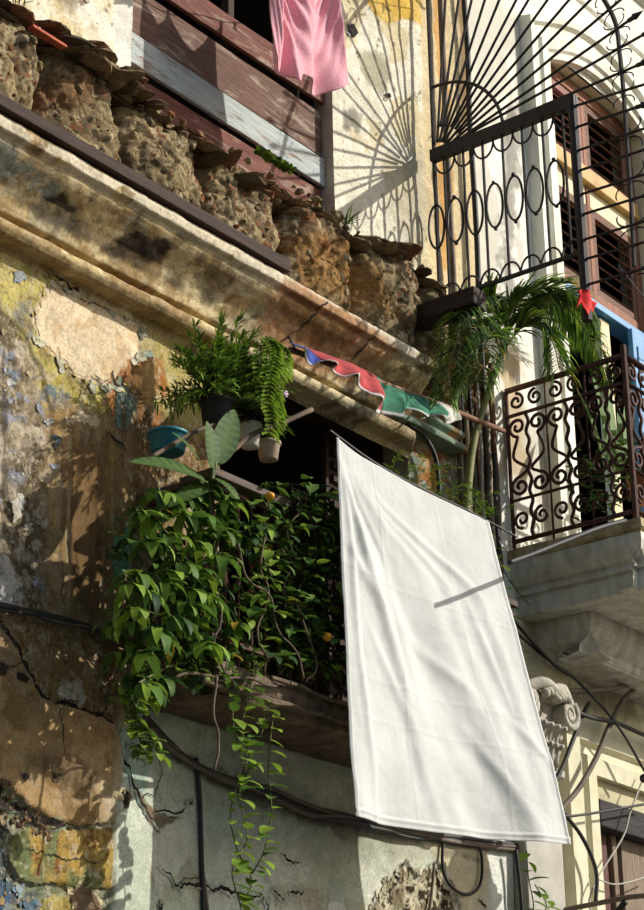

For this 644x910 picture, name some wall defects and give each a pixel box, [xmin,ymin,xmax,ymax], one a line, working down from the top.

spalling [0,17,451,396]
crack [293,301,329,334]
spalling [0,279,154,605]
crack [0,621,187,833]
crack [0,785,112,864]
peeling [0,877,42,910]
peeling [67,880,103,909]
crack [157,865,305,910]
crack [280,854,301,867]
spalling [369,858,462,910]